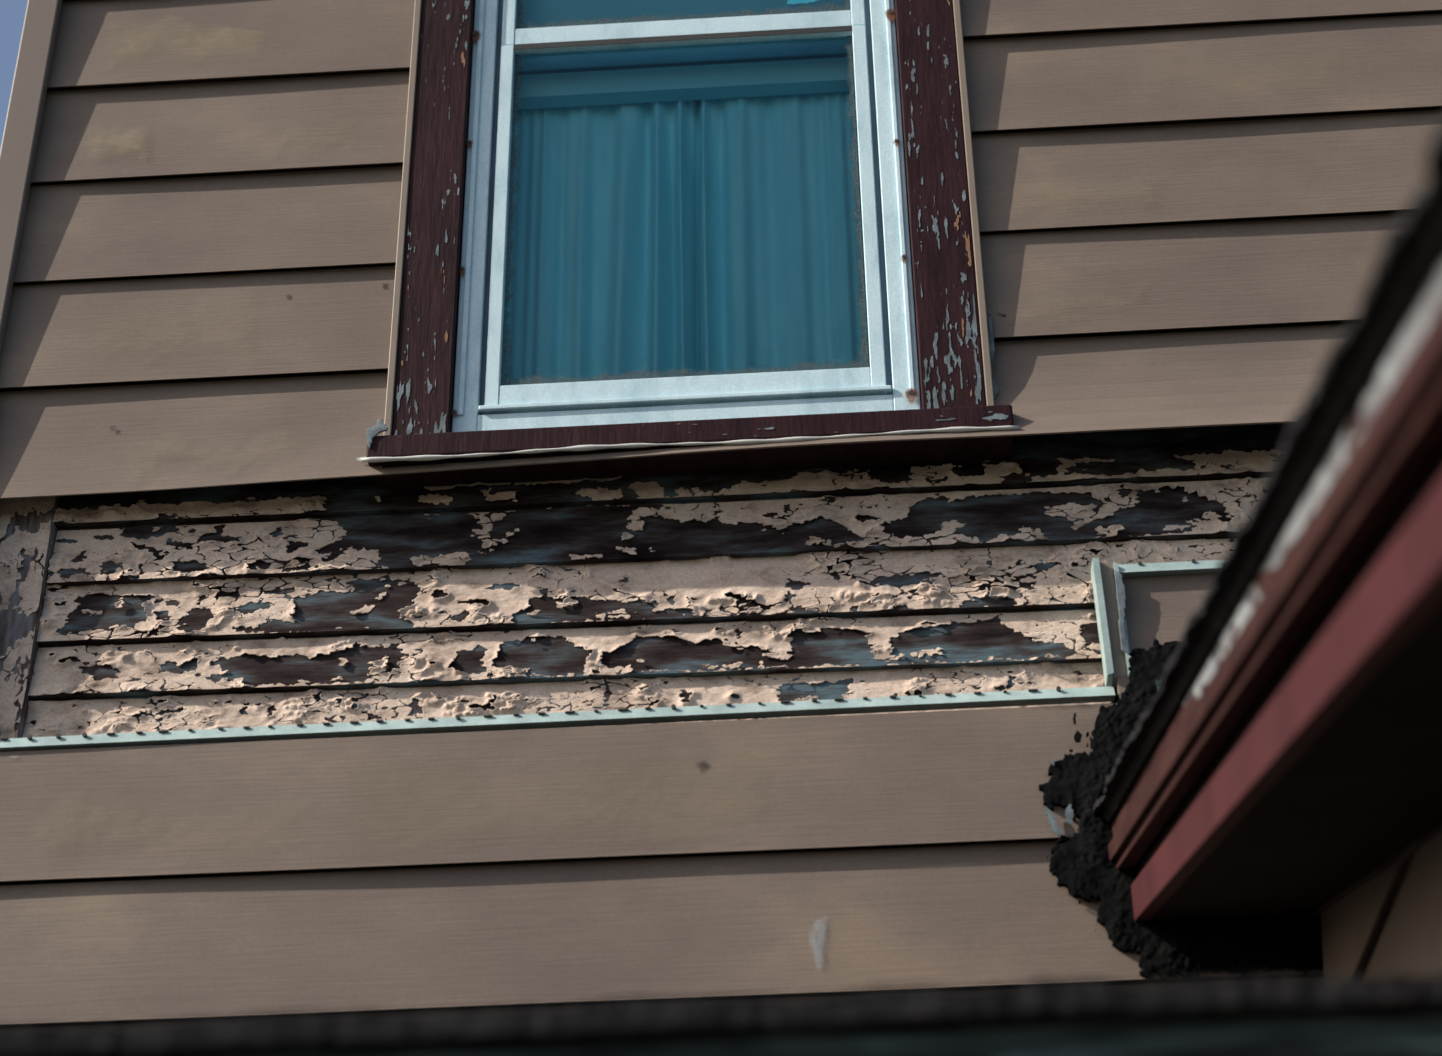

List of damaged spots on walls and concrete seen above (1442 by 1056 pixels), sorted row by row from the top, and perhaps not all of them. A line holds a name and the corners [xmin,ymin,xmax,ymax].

peeling [432,0,470,118]
peeling [904,0,958,159]
peeling [914,172,1008,421]
peeling [394,319,448,437]
peeling [0,423,1288,738]